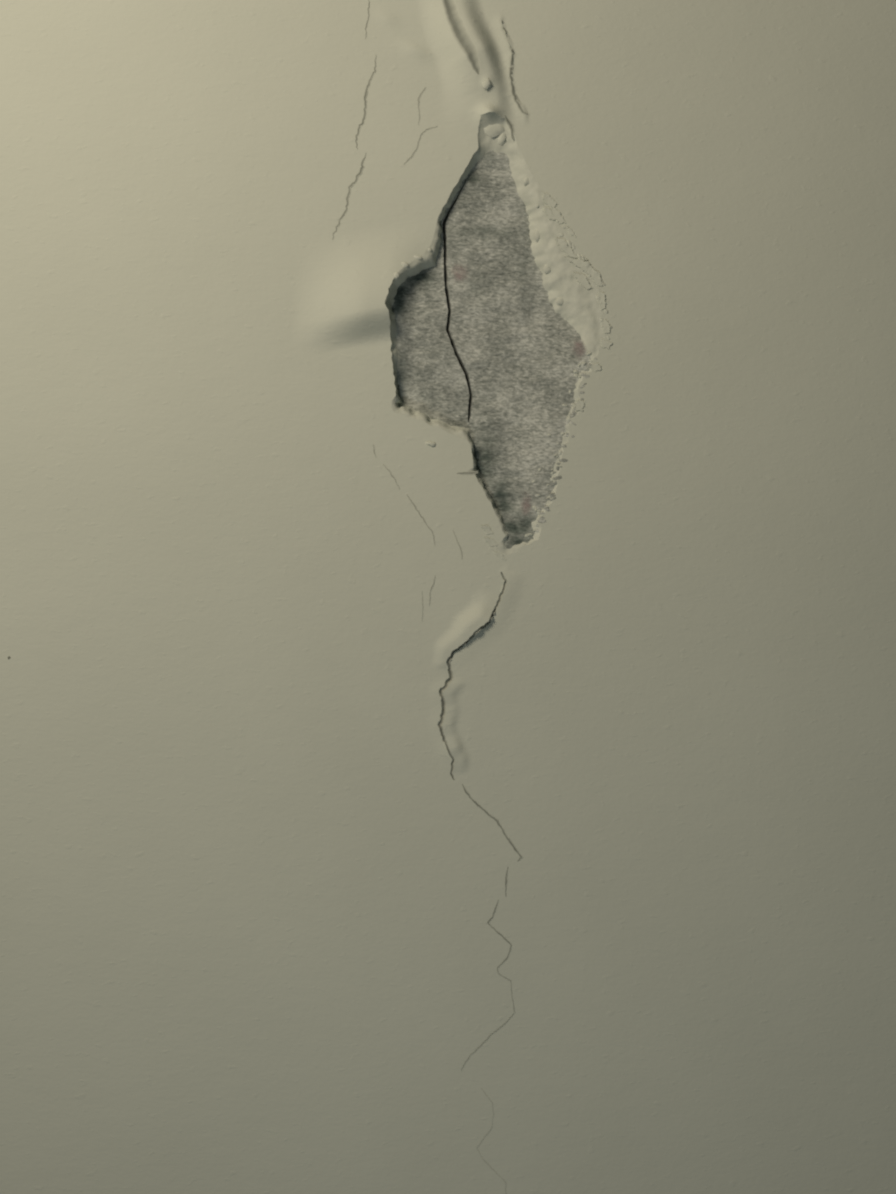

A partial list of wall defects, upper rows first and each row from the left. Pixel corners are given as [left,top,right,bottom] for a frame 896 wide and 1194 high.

crack [332,0,377,240]
crack [441,0,481,75]
crack [501,20,528,140]
spalling [385,112,605,555]
crack [437,572,522,1193]